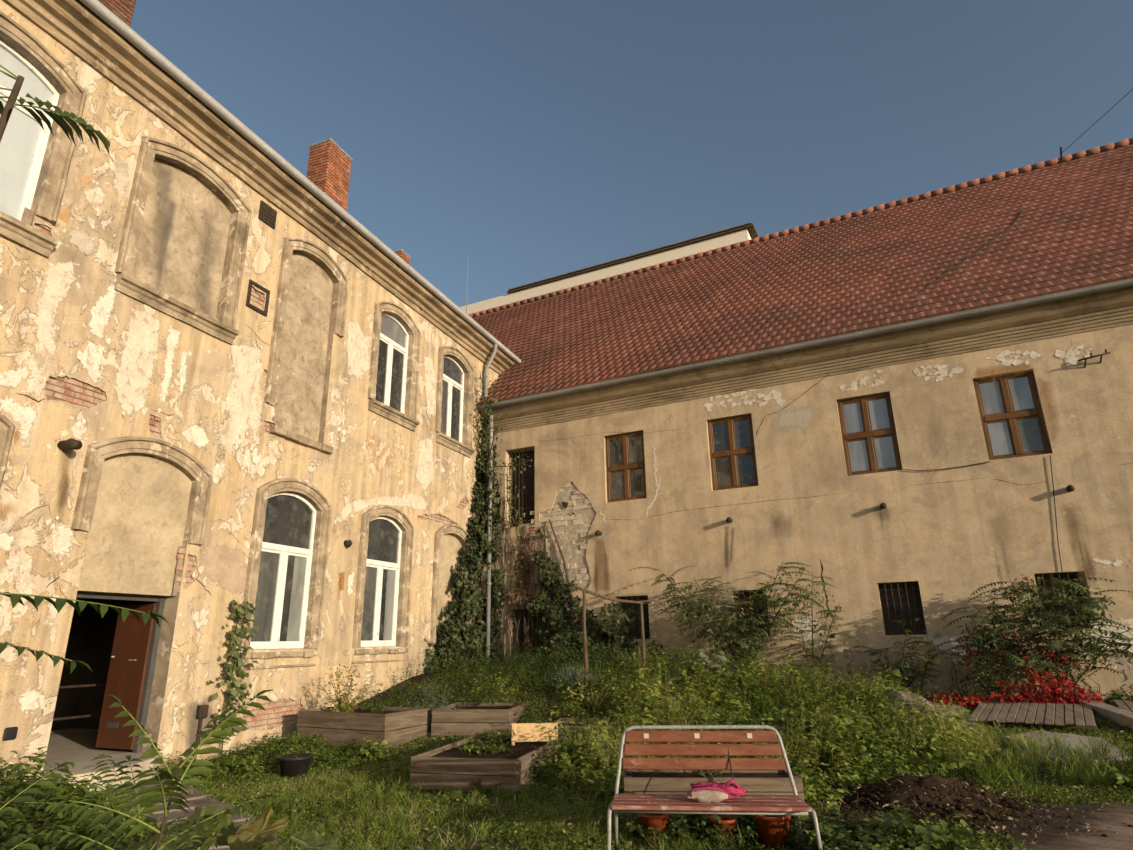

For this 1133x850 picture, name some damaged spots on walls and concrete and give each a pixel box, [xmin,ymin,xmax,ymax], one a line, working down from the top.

peeling [0,156,192,454]
peeling [181,343,283,484]
spalling [250,285,266,309]
peeling [346,320,370,379]
peeling [703,389,786,412]
peeling [986,345,1094,366]
peeling [0,532,35,636]
peeling [44,594,62,642]
peeling [46,454,84,557]
spalling [518,480,597,603]
crack [544,428,840,523]
peeling [1082,617,1133,688]